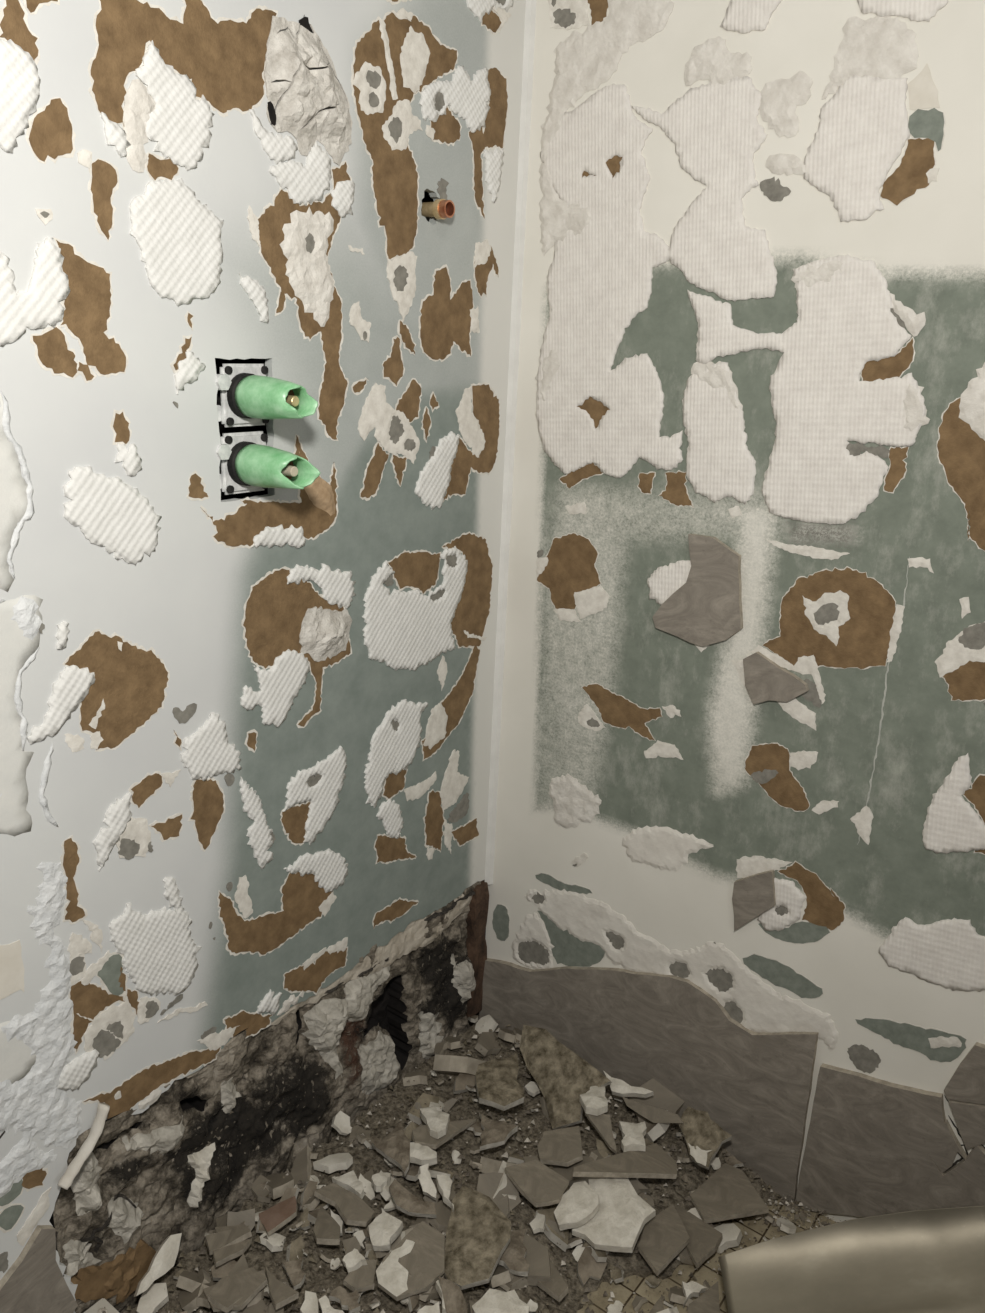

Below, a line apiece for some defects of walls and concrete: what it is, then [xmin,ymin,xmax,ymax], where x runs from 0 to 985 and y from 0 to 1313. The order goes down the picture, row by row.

peeling [0,0,513,510]
peeling [186,463,339,550]
peeling [536,533,609,622]
peeling [937,397,985,551]
peeling [374,645,481,864]
peeling [763,540,934,845]
peeling [27,563,356,1120]
peeling [732,855,846,944]
leakage [108,1032,330,1212]
leakage [342,986,385,1080]
leakage [403,933,470,1029]
peeling [847,1018,967,1074]